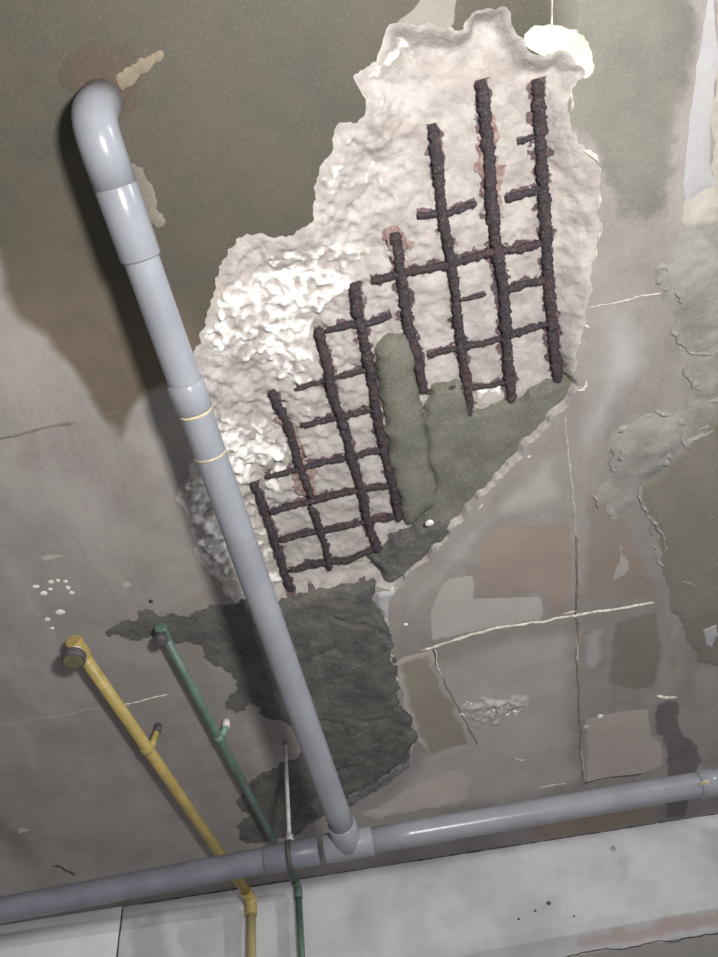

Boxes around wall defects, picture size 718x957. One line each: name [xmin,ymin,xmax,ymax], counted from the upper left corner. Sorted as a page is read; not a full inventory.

damp [0,0,419,454]
spalling [193,0,602,626]
corrosion [382,225,415,268]
corrosion [474,114,507,218]
damp [451,0,706,250]
corrosion [274,415,319,496]
peeling [593,396,718,519]
spalling [176,460,246,603]
damp [368,285,706,820]
crack [421,417,655,788]
crack [116,813,718,957]